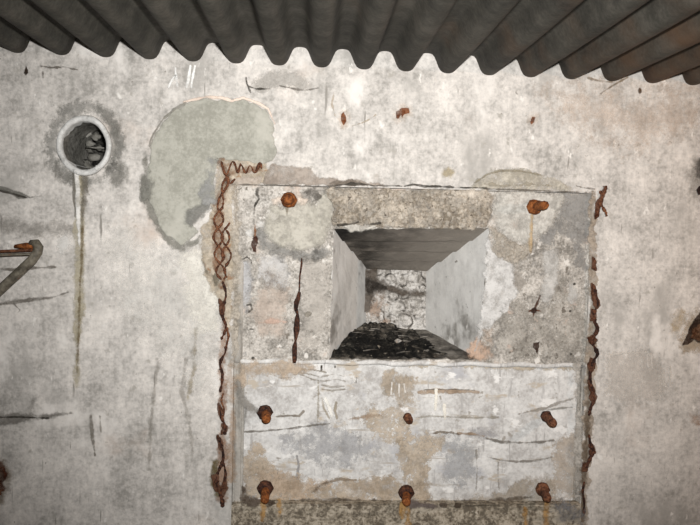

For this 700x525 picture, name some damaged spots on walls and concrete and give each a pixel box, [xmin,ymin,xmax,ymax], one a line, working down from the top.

water stain [44,102,125,384]
water stain [115,240,218,398]
rust [211,355,228,502]
rust [240,486,281,521]
peeling [235,250,330,387]
spalling [200,158,494,365]
peeling [243,369,480,501]
spalling [464,191,598,525]
rust [587,357,598,404]
rust [590,283,601,321]
rust [594,186,607,219]
rust [673,312,700,352]